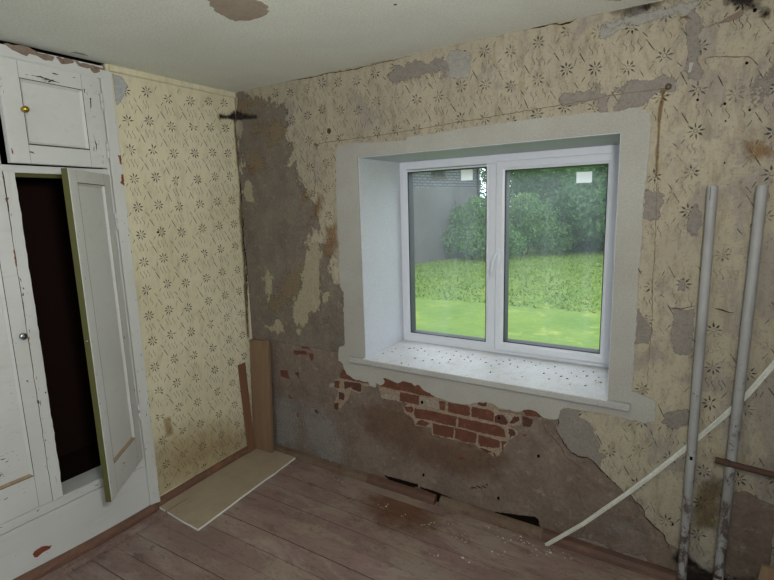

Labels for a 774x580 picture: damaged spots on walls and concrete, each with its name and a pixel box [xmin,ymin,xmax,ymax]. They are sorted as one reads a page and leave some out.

peeling [207,0,270,21]
peeling [603,0,744,80]
peeling [387,57,449,83]
peeling [558,74,676,113]
flaking render [235,91,690,571]